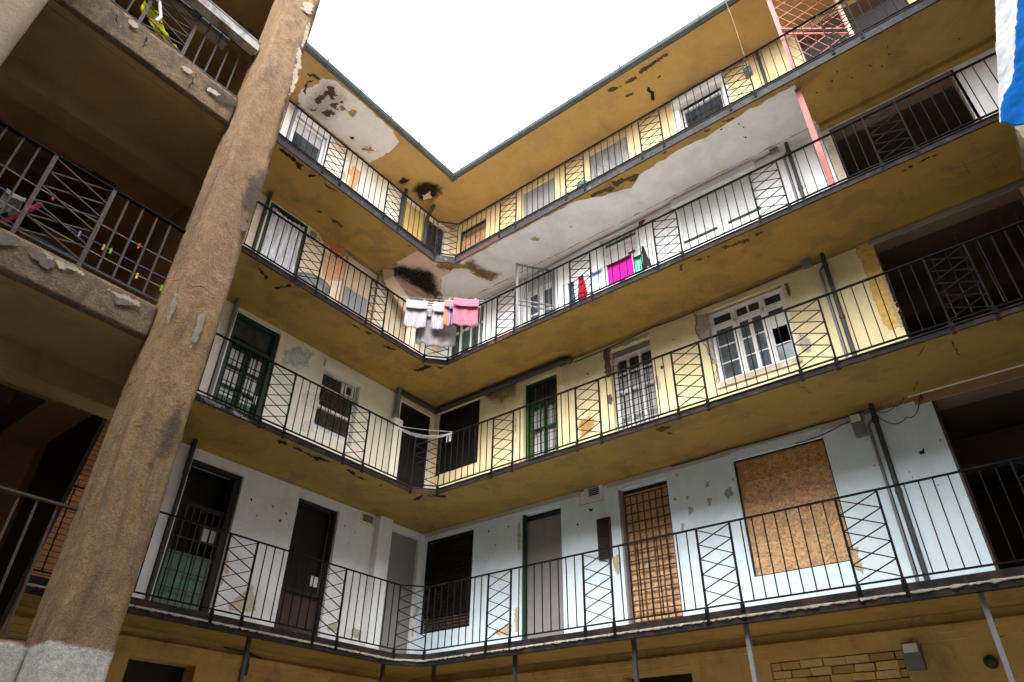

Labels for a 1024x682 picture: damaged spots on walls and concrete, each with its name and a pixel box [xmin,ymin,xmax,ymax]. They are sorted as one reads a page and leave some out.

spalling [289,1,344,117]
peeling [608,53,668,101]
peeling [590,174,639,198]
spalling [0,232,85,275]
spalling [107,288,140,306]
water stain [392,265,438,296]
spalling [439,262,492,281]
peeling [856,243,903,330]
spalling [189,312,207,349]
spalling [694,314,717,364]